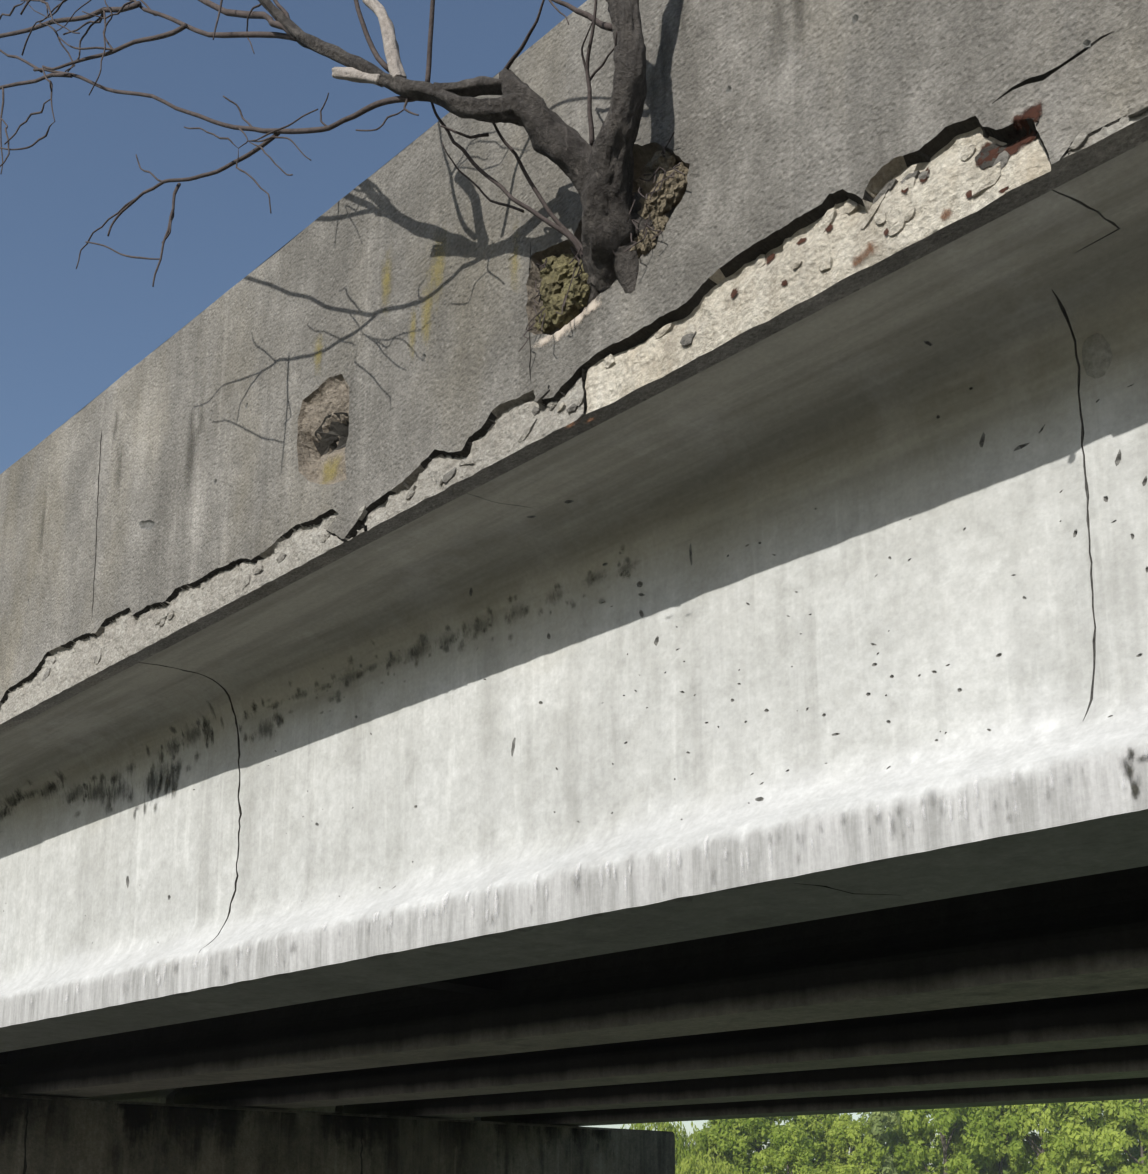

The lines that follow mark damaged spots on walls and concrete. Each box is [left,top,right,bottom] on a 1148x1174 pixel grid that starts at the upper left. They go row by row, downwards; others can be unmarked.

crack [992,31,1114,104]
rust [976,102,1042,166]
spalling [1068,96,1148,156]
spalling [0,106,1051,724]
crack [1051,289,1096,721]
leakage [0,766,132,816]
leakage [134,703,223,814]
crack [139,662,242,952]
crack [22,1101,30,1174]